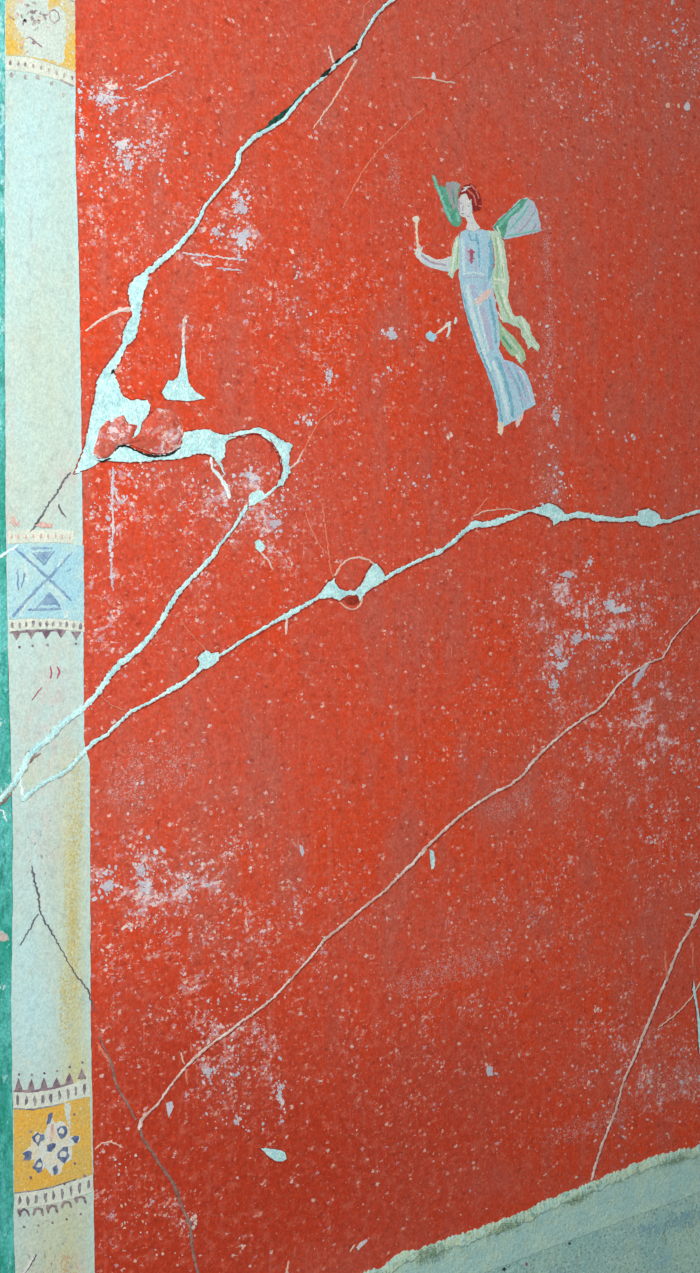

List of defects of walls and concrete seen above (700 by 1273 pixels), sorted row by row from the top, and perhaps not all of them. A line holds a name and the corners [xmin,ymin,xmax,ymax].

crack [145,0,397,275]
crack [342,36,514,209]
spalling [73,269,334,518]
crack [0,472,71,558]
peeling [106,487,123,579]
peeling [254,539,273,570]
peeling [269,513,282,533]
crack [0,497,700,822]
crack [20,607,700,1273]
peeling [259,1147,287,1163]